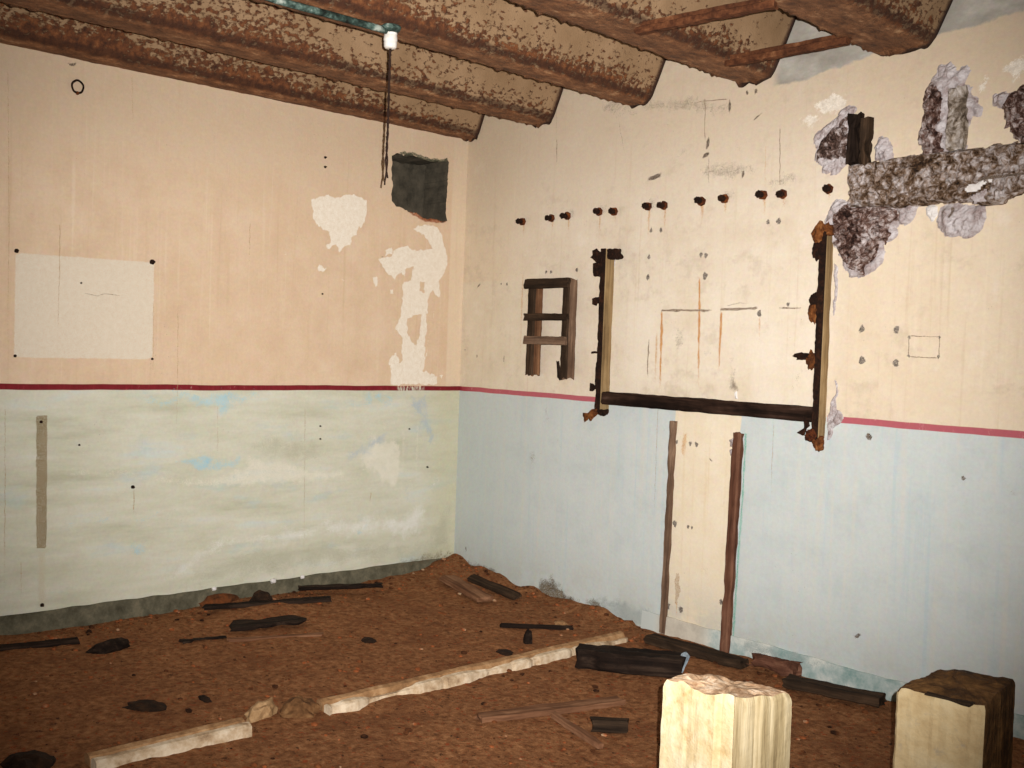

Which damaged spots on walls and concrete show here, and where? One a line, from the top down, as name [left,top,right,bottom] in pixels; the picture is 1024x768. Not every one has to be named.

spalling [801,93,857,175]
spalling [874,136,894,162]
spalling [917,55,1024,154]
peeling [311,194,367,252]
peeling [373,151,449,386]
spalling [824,179,992,316]
corrosion [654,312,663,386]
spalling [827,380,844,440]